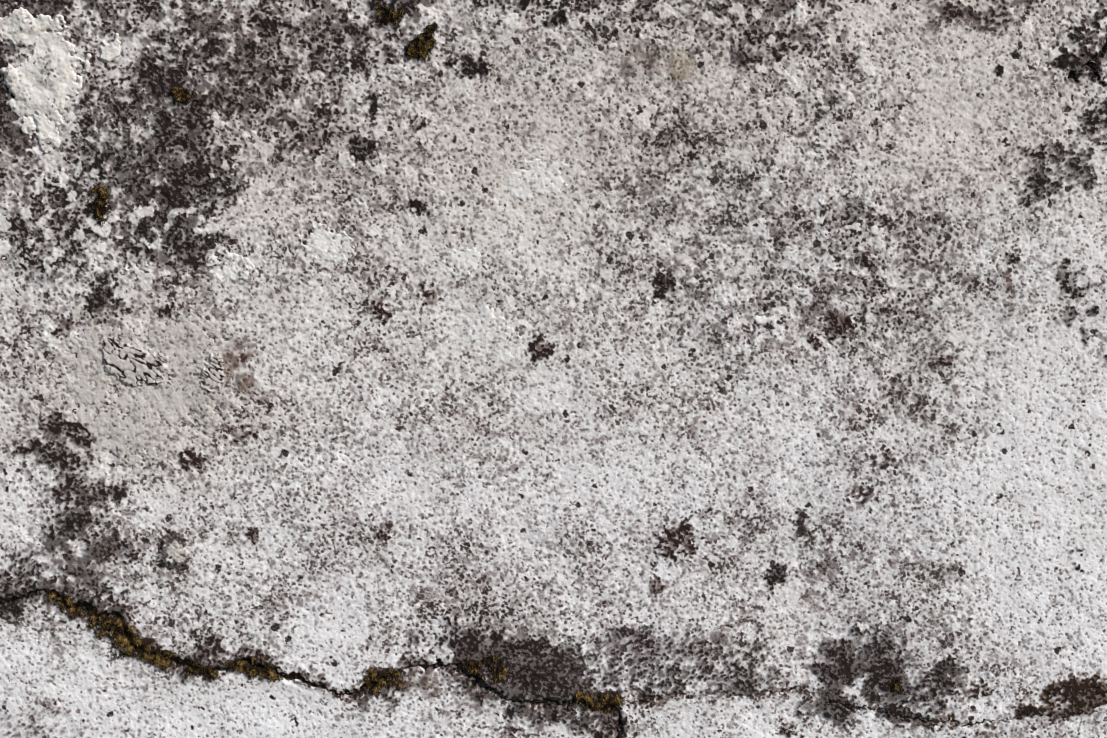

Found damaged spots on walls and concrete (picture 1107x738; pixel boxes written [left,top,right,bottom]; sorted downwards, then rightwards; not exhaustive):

water stain [473,0,567,10]
water stain [612,0,669,22]
water stain [673,0,842,77]
crack [1064,16,1107,87]
water stain [0,0,434,322]
water stain [360,636,433,711]
crack [0,581,1017,738]
water stain [439,617,783,738]
mould [796,617,964,728]